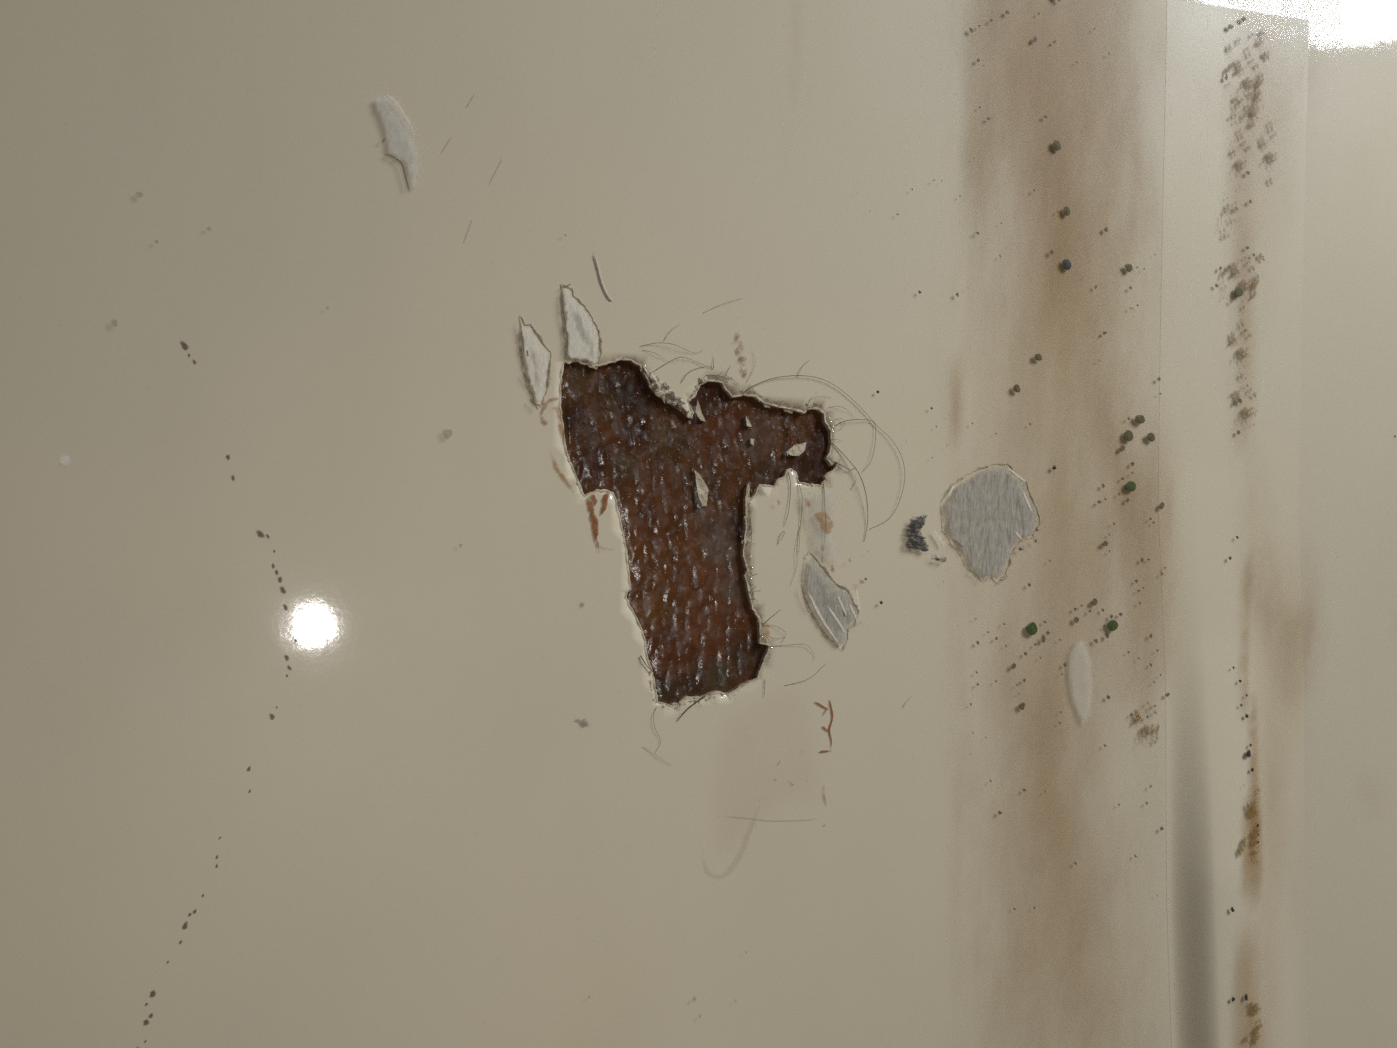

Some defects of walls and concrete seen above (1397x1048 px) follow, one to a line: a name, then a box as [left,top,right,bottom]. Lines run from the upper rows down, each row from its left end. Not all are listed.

damp [1225,17,1277,185]
peeling [518,284,606,410]
damp [1215,246,1265,434]
corrosion [587,493,609,547]
peeling [695,400,706,422]
peeling [694,470,709,507]
peeling [785,442,806,456]
peeling [934,463,1041,583]
damp [1097,415,1155,504]
peeling [801,551,860,652]
damp [1011,621,1061,710]
damp [1074,599,1123,643]